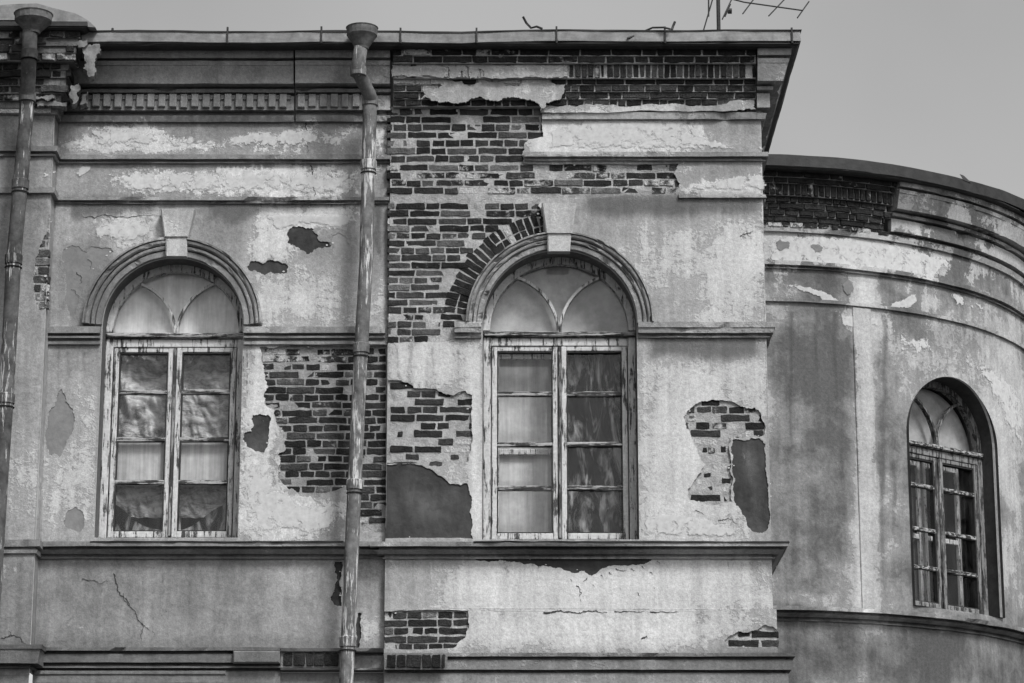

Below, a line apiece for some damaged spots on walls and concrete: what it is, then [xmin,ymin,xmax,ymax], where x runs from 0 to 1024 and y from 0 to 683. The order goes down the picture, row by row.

flaking render [34,30,101,123]
peeling [92,126,344,148]
peeling [33,215,155,317]
spalling [247,260,288,275]
peeling [267,214,350,254]
flaking render [360,49,765,536]
flaking render [694,170,948,278]
flaking render [245,345,354,535]
spalling [476,559,652,576]
crack [84,573,149,639]
flaking render [377,608,471,669]
flaking render [725,625,779,648]